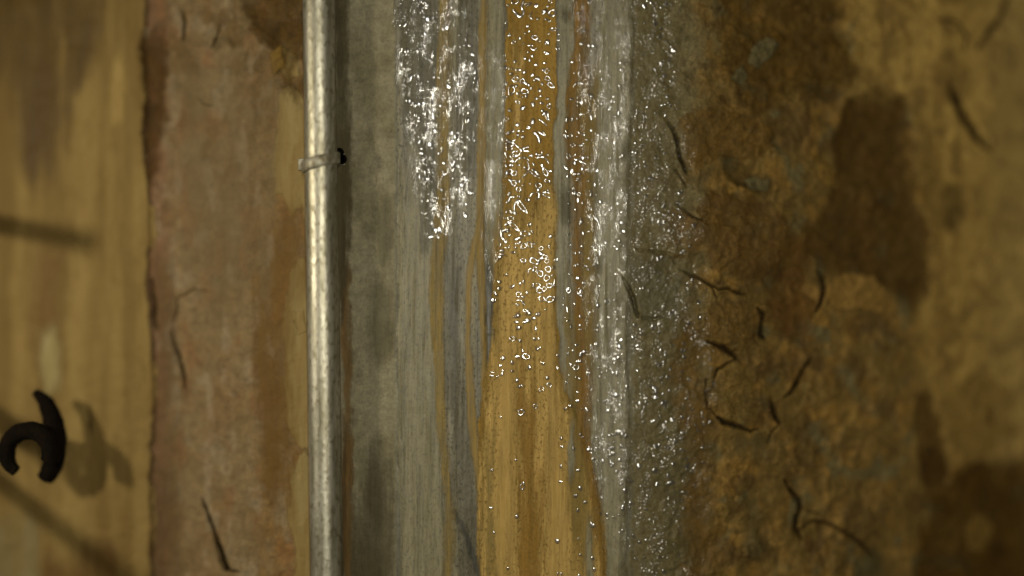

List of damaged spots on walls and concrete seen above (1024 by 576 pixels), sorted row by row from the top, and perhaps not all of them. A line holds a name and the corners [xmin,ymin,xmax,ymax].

crack [948,84,992,153]
crack [668,125,703,221]
damp [352,0,508,576]
rust [465,0,606,576]
damp [552,0,708,576]
crack [628,285,666,320]
crack [647,251,765,339]
crack [815,270,825,312]
crack [704,341,811,443]
crack [203,498,240,573]
crack [784,479,873,556]